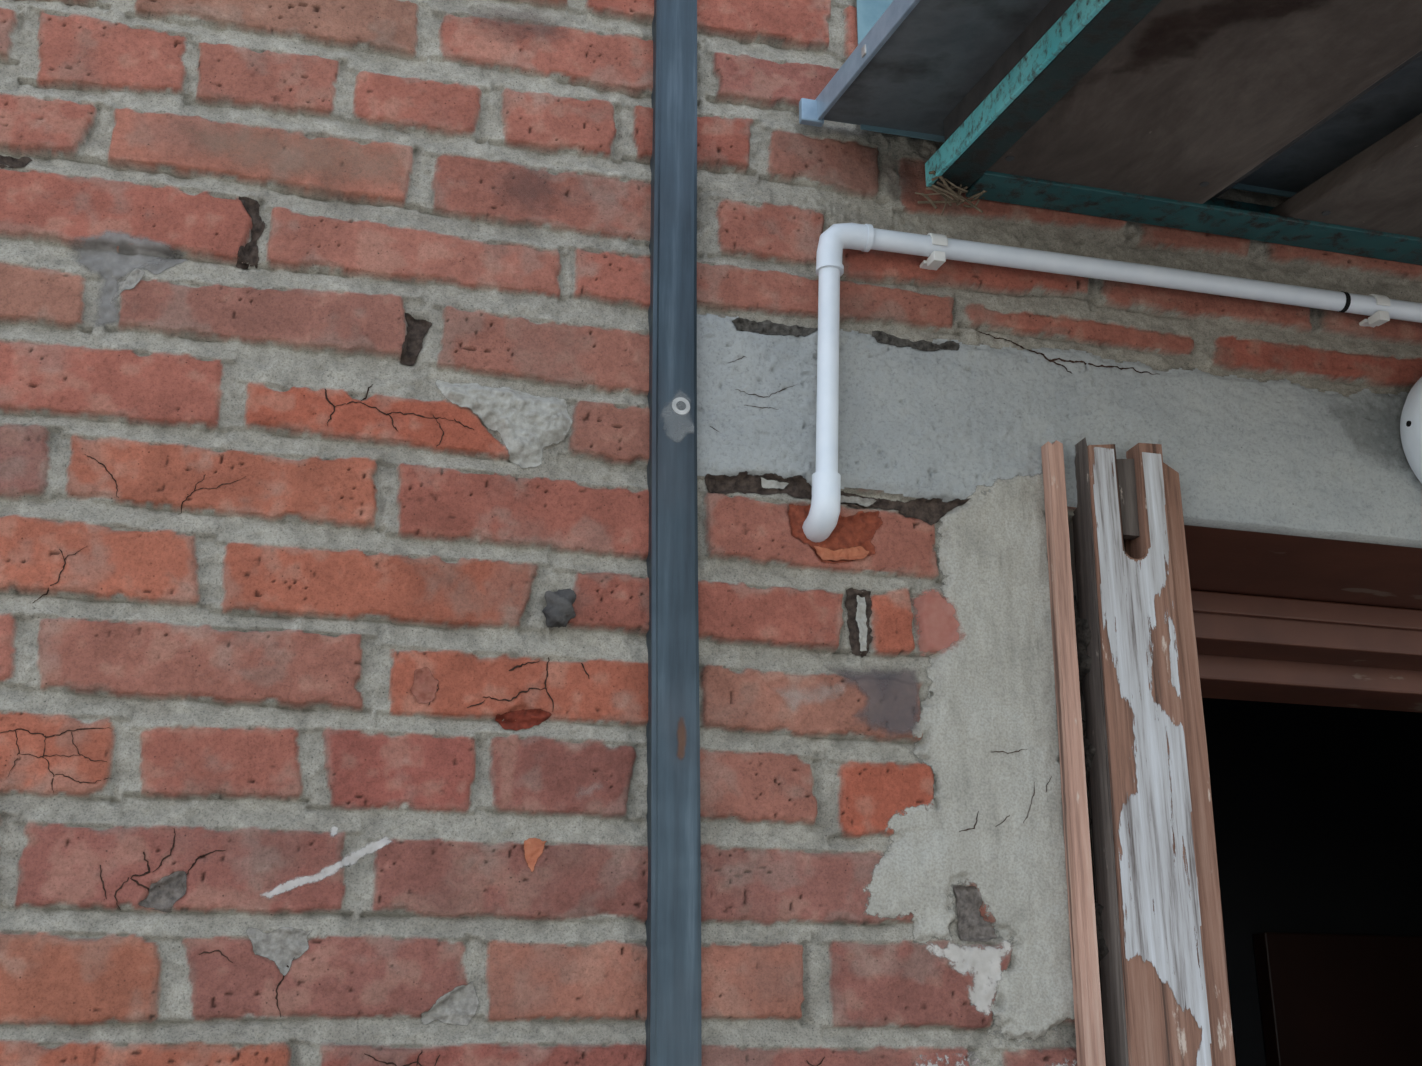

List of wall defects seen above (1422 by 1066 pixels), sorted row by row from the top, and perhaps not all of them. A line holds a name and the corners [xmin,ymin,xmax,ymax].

crack [971,328,1154,375]
crack [325,384,474,447]
crack [0,727,113,792]
peeling [705,471,1075,1043]
crack [100,828,226,910]
crack [364,1052,440,1066]